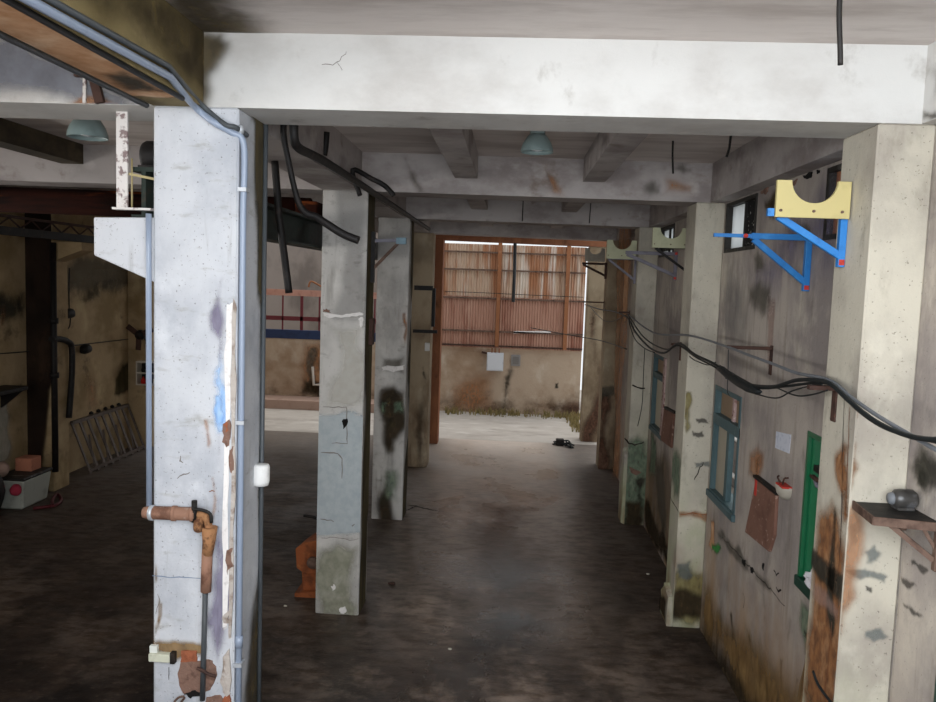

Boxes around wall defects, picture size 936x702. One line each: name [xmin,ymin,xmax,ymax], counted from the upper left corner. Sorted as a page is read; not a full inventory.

peeling [178,298,237,702]
leakage [378,473,396,520]
leakage [379,388,405,452]
leakage [624,434,680,561]
rust [805,407,861,702]
leakage [914,449,936,489]
leakage [673,564,798,702]
leakage [801,605,809,646]